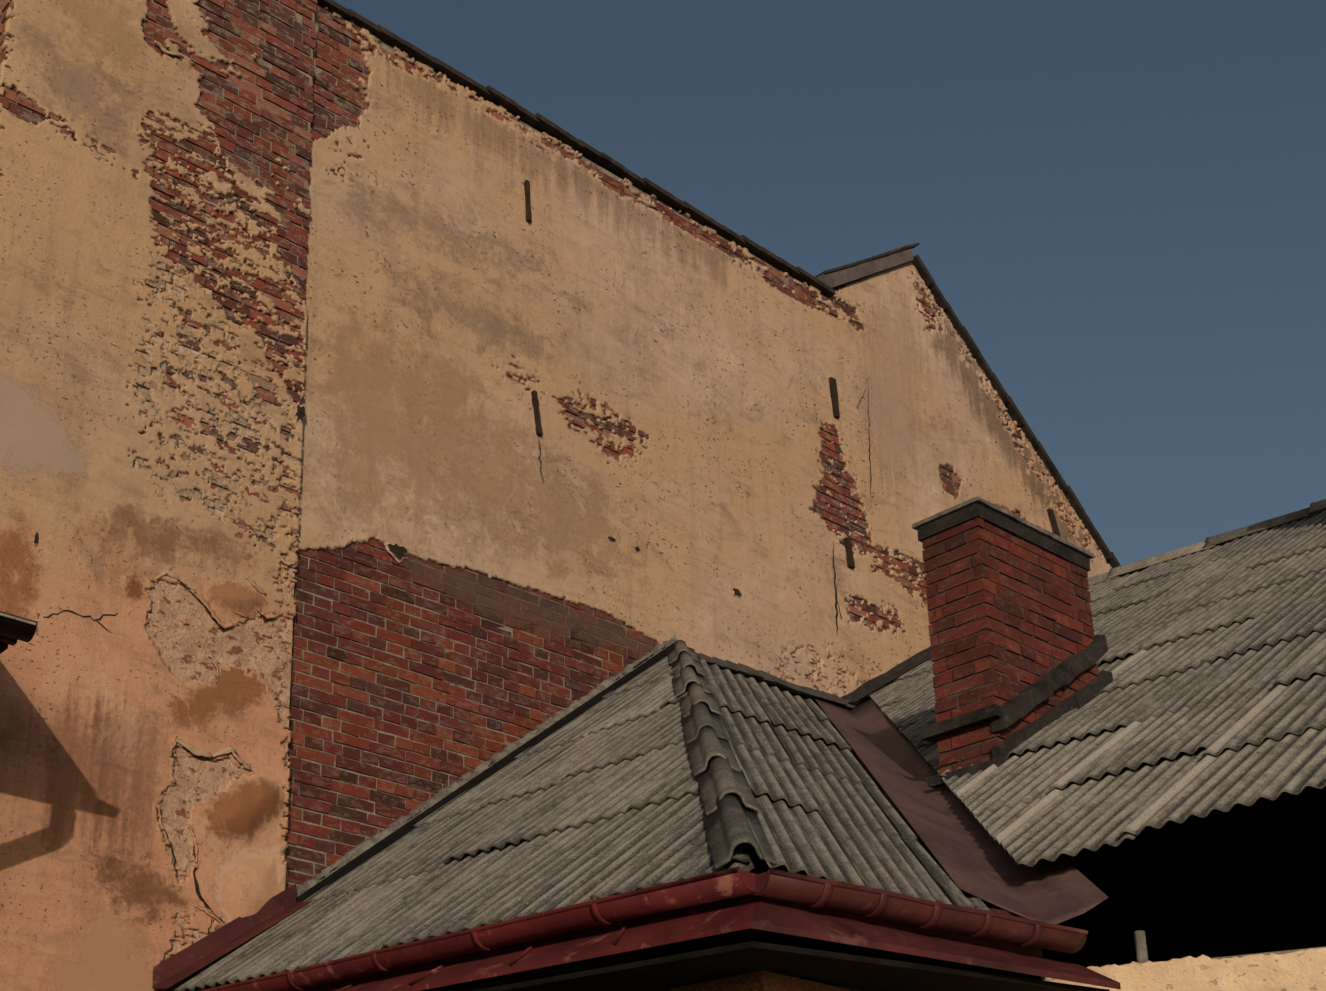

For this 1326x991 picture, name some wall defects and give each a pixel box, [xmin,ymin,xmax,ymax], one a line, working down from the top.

flaking render [0,0,881,889]
flaking render [809,419,928,608]
crack [43,609,118,633]
flaking render [845,595,906,639]
water stain [100,859,185,920]
flaking render [160,904,226,963]